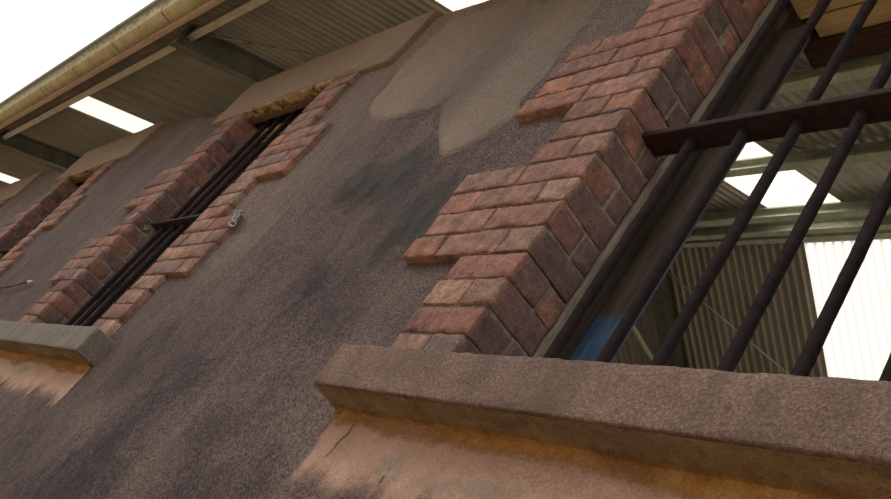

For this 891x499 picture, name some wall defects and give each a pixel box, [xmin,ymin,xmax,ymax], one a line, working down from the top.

flaking render [245,78,334,118]